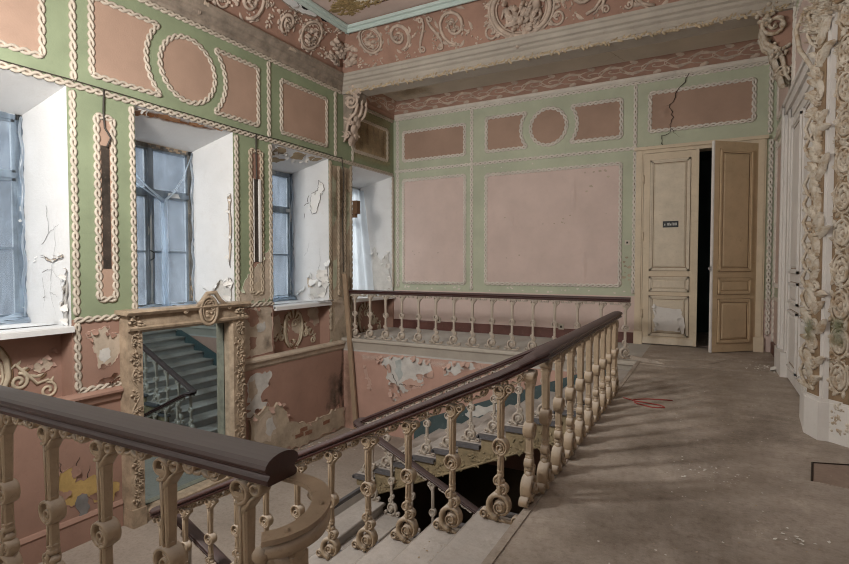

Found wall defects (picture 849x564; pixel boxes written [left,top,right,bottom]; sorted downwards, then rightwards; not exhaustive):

crack [661,74,689,145]
peeling [272,145,322,164]
peeling [202,193,233,302]
spalling [245,165,352,359]
peeling [371,247,418,291]
peeling [86,325,120,385]
peeling [375,355,481,403]
spalling [246,370,346,450]
peeling [59,458,98,516]